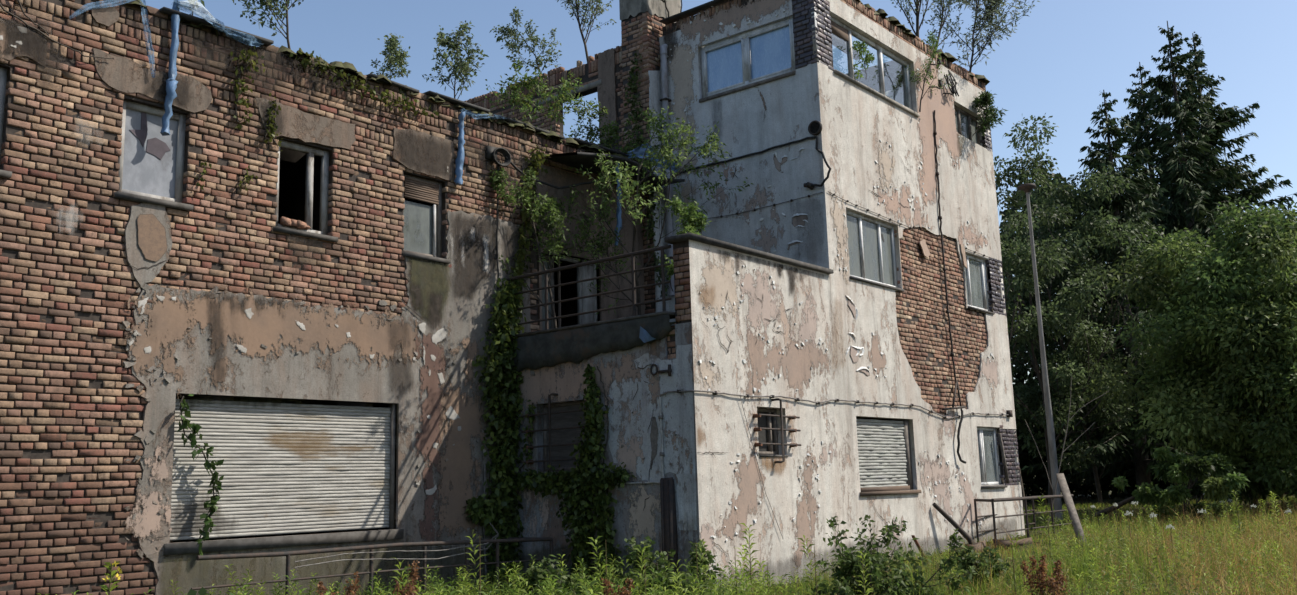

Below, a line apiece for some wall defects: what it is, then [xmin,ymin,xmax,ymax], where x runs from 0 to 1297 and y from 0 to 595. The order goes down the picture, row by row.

peeling [667,0,808,253]
water stain [210,296,296,383]
peeling [115,284,491,547]
water stain [411,213,534,328]
peeling [514,352,696,544]
peeling [700,436,766,570]
peeling [692,252,829,404]
peeling [792,439,837,568]
peeling [830,189,888,378]
flaking render [873,55,1000,416]